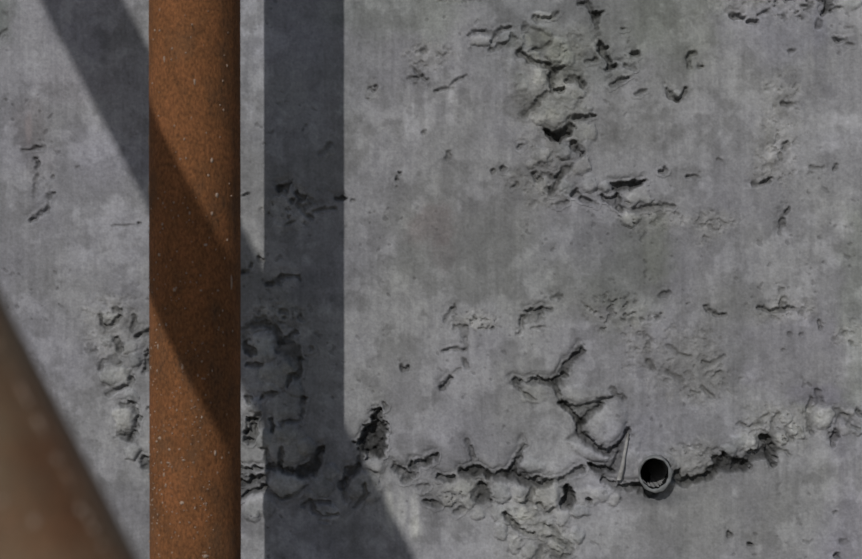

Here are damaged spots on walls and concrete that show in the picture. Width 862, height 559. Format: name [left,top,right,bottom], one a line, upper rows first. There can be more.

hole [705,0,818,29]
spalling [549,19,621,112]
spalling [488,98,570,225]
hole [76,288,148,369]
crack [642,340,728,403]
spalling [664,432,720,472]
crack [733,409,773,432]